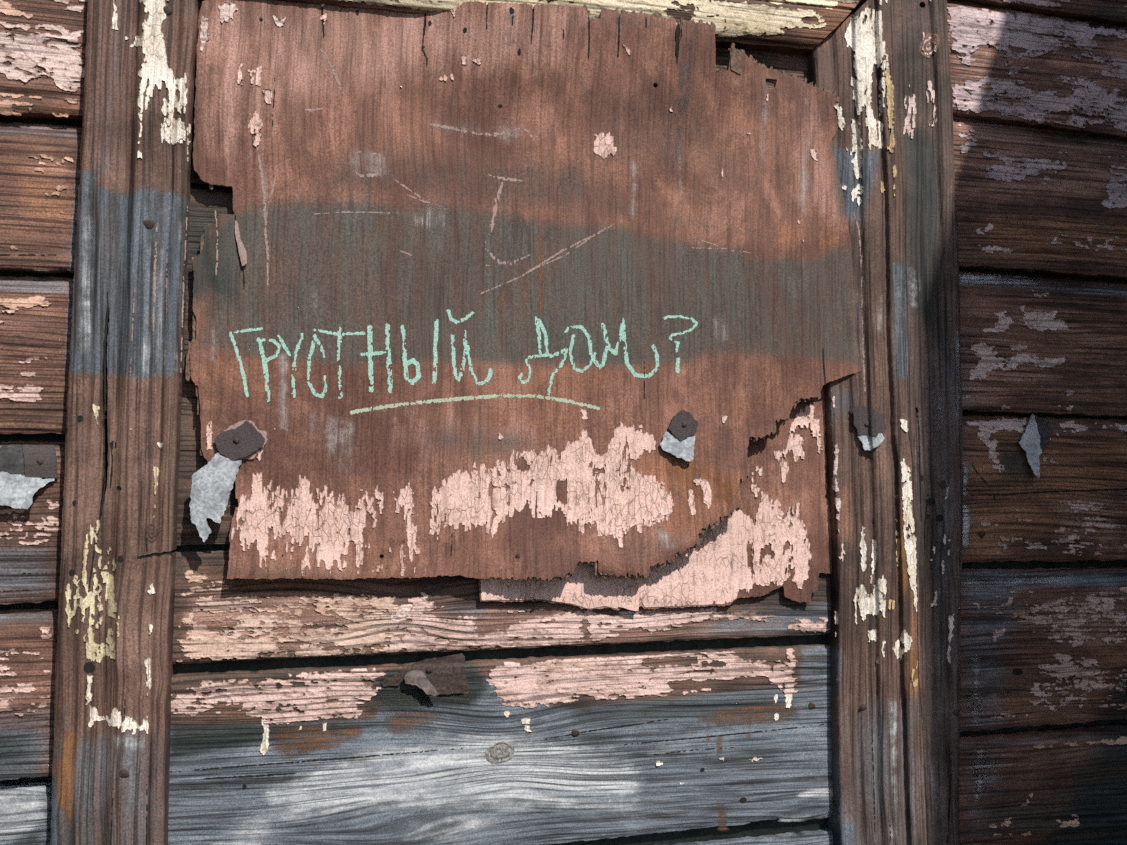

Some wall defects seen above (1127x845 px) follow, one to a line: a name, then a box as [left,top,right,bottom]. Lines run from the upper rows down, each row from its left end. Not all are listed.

peeling [0,0,88,118]
peeling [112,0,191,161]
peeling [340,0,937,206]
peeling [947,0,1127,185]
peeling [65,520,120,663]
peeling [231,409,674,576]
peeling [176,466,812,662]
peeling [773,401,845,562]
peeling [853,526,918,687]
peeling [895,458,951,612]
peeling [171,668,386,755]
peeling [486,648,798,732]